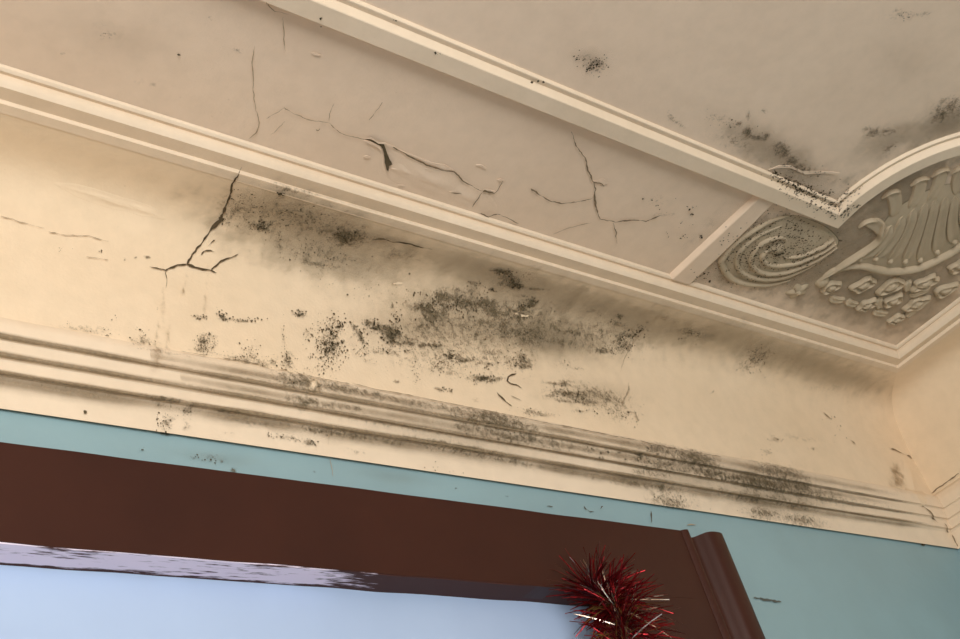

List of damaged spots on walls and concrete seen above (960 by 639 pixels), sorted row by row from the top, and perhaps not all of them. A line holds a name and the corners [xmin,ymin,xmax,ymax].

crack [249,46,382,140]
crack [152,167,242,285]
leakage [217,188,373,274]
crack [393,147,516,223]
crack [531,132,659,239]
leakage [694,145,873,291]
leakage [0,268,913,530]